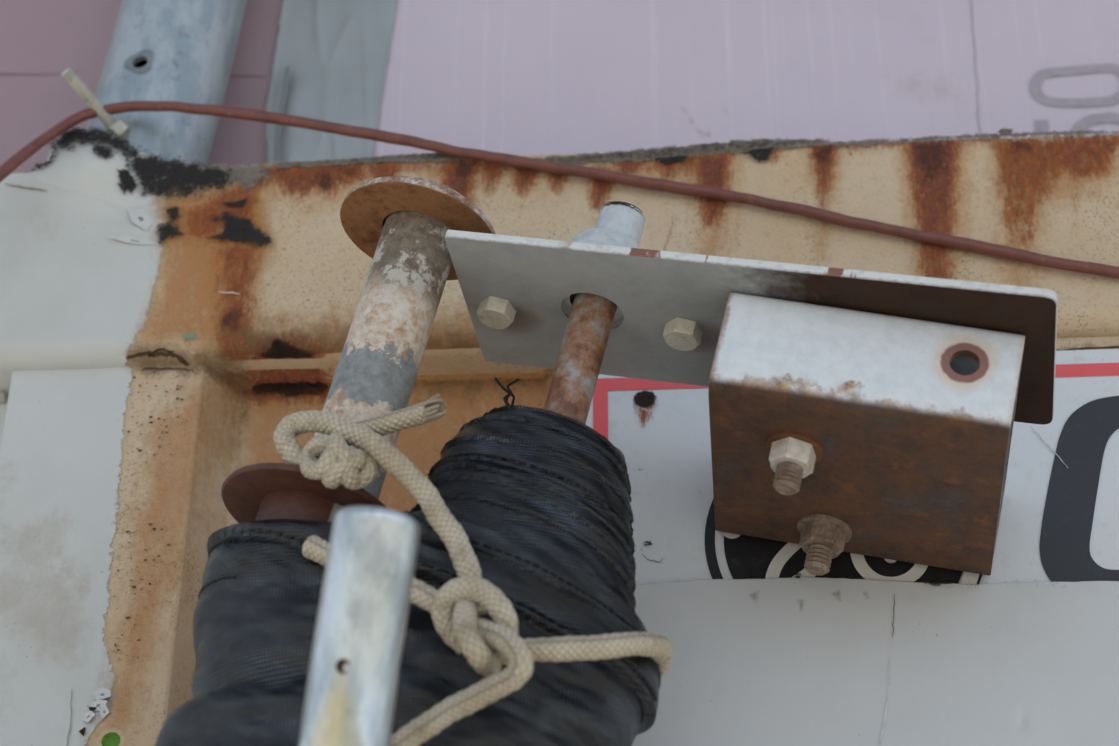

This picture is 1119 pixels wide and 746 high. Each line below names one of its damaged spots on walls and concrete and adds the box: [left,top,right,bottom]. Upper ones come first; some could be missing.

peeling [155,206,184,245]
peeling [206,198,272,246]
corrosion [590,151,732,248]
corrosion [808,134,1119,279]
corrosion [151,158,567,476]
corrosion [378,471,418,511]